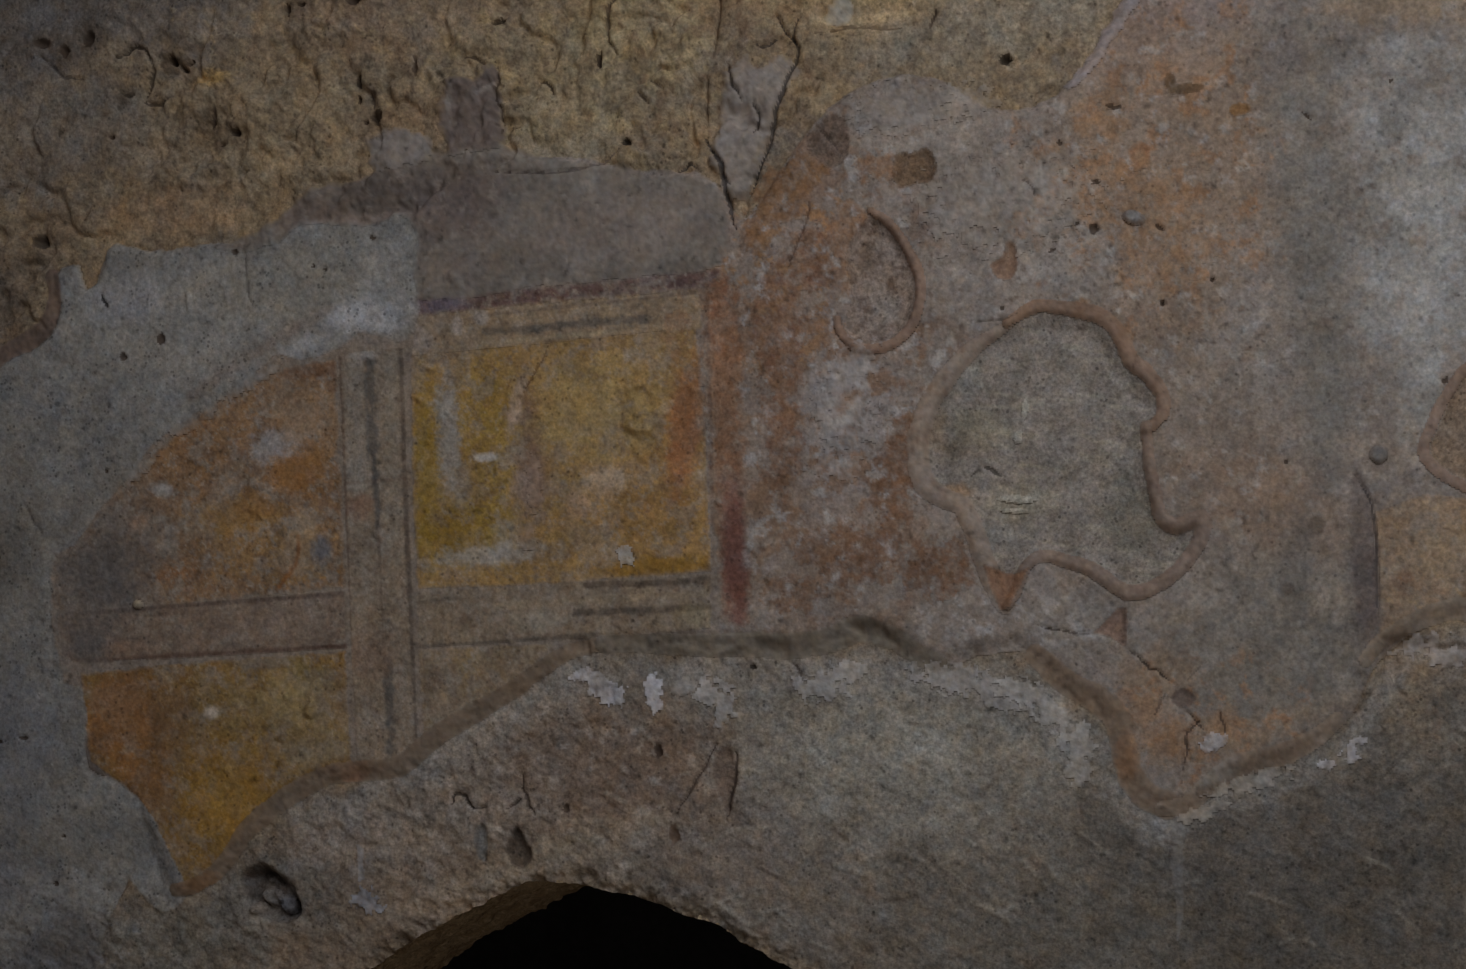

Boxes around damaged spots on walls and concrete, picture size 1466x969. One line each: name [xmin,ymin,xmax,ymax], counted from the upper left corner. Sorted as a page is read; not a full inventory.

spalling [13,10,107,73]
spalling [160,44,195,77]
spalling [202,86,250,155]
spalling [346,59,396,142]
crack [599,0,617,69]
crack [637,80,662,104]
crack [679,0,902,230]
spalling [805,113,850,169]
spalling [891,147,937,188]
crack [1129,650,1226,784]
spalling [506,825,533,869]
spalling [224,862,302,938]